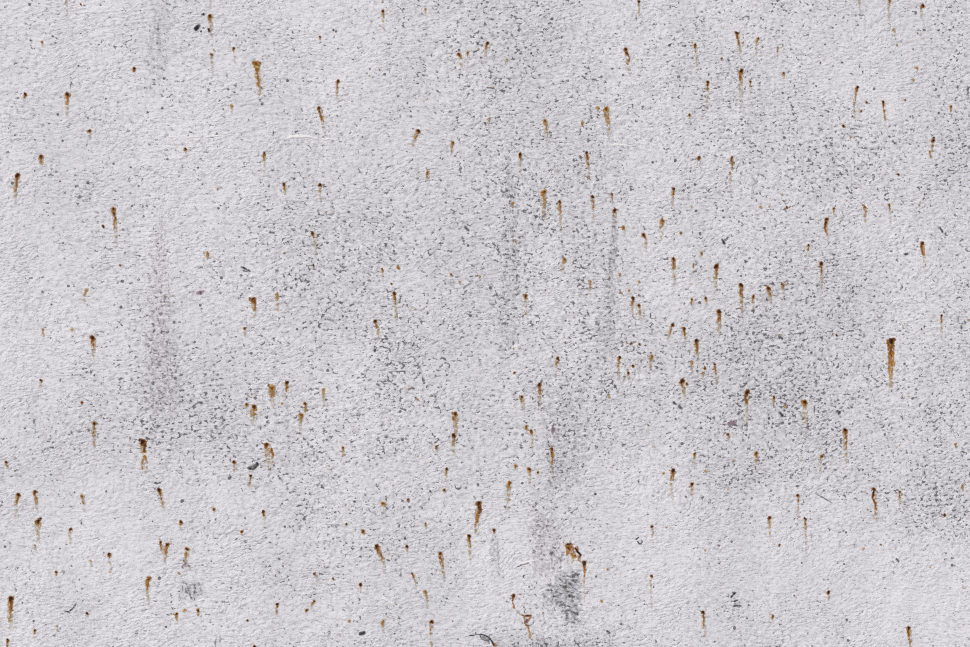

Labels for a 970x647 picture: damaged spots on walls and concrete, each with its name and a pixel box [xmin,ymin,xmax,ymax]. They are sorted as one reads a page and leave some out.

rust [252,60,261,92]
rust [664,320,718,383]
rust [887,338,896,386]
rust [139,438,148,470]
rust [467,501,482,556]
rust [565,543,587,583]